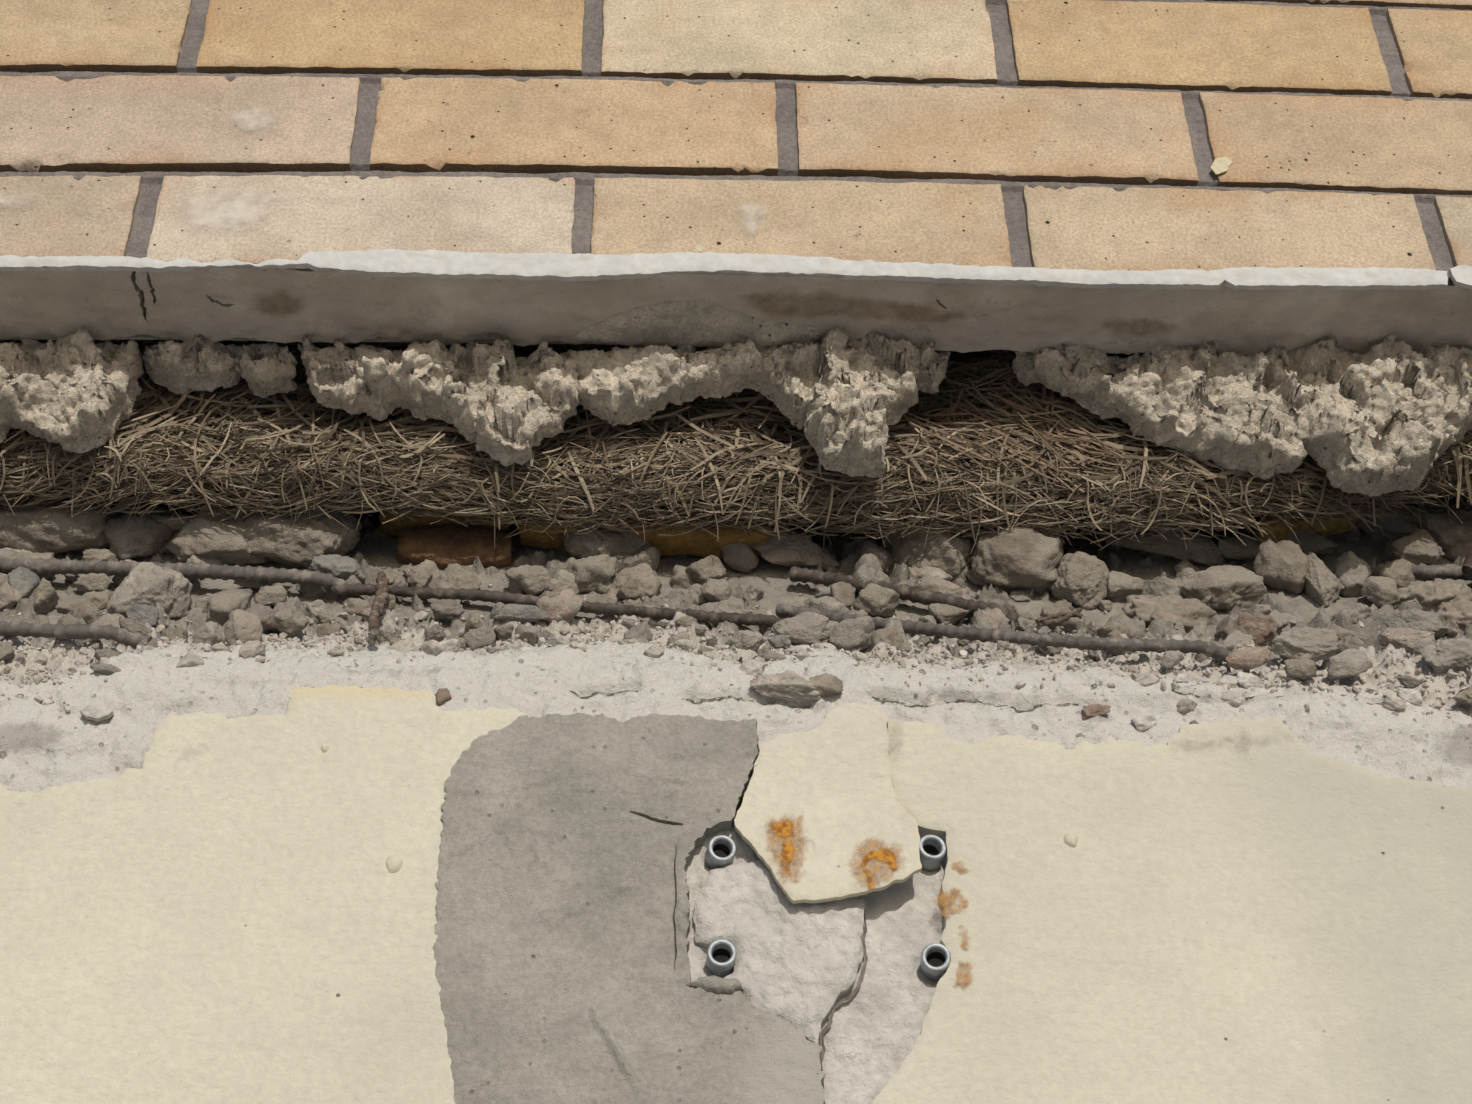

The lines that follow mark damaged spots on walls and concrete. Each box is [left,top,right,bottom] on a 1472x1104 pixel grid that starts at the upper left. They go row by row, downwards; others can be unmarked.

crack [131,271,156,322]
spalling [315,336,423,346]
crack [735,746,760,817]
flaking render [0,514,1472,1104]
corrosion [770,820,802,881]
corrosion [855,841,898,889]
corrosion [936,862,968,916]
corrosion [957,940,972,986]
crack [820,910,868,1104]